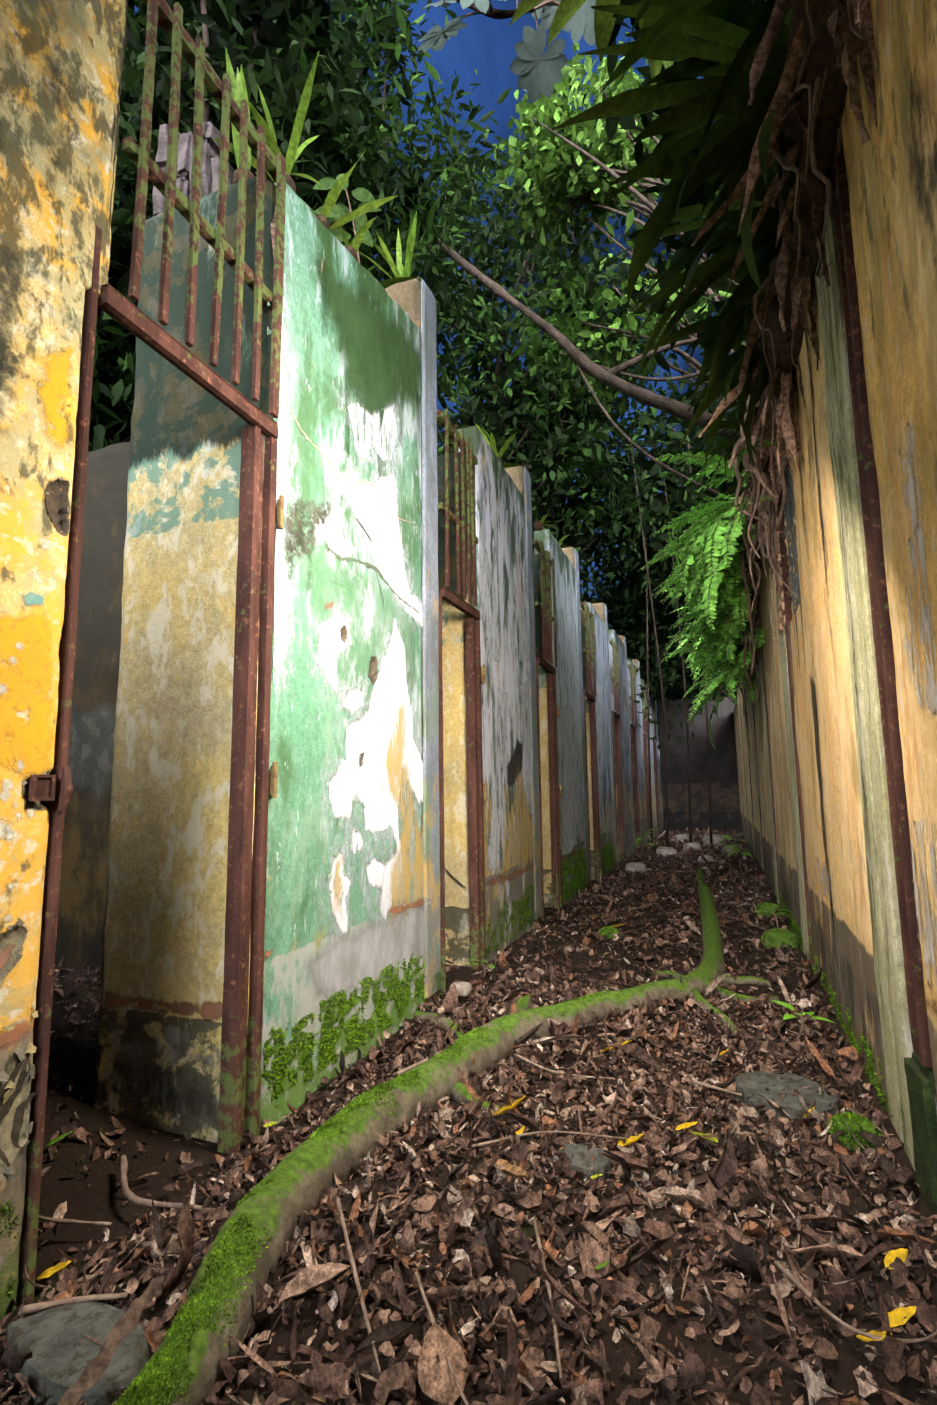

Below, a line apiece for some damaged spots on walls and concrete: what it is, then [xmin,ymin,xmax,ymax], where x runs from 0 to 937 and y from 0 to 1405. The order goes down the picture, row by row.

leakage [43,57,71,100]
leakage [908,80,937,229]
leakage [0,246,21,374]
peeling [267,274,298,690]
leakage [68,704,116,808]
peeling [310,391,432,995]
spalling [0,917,28,988]
peeling [0,1011,38,1175]